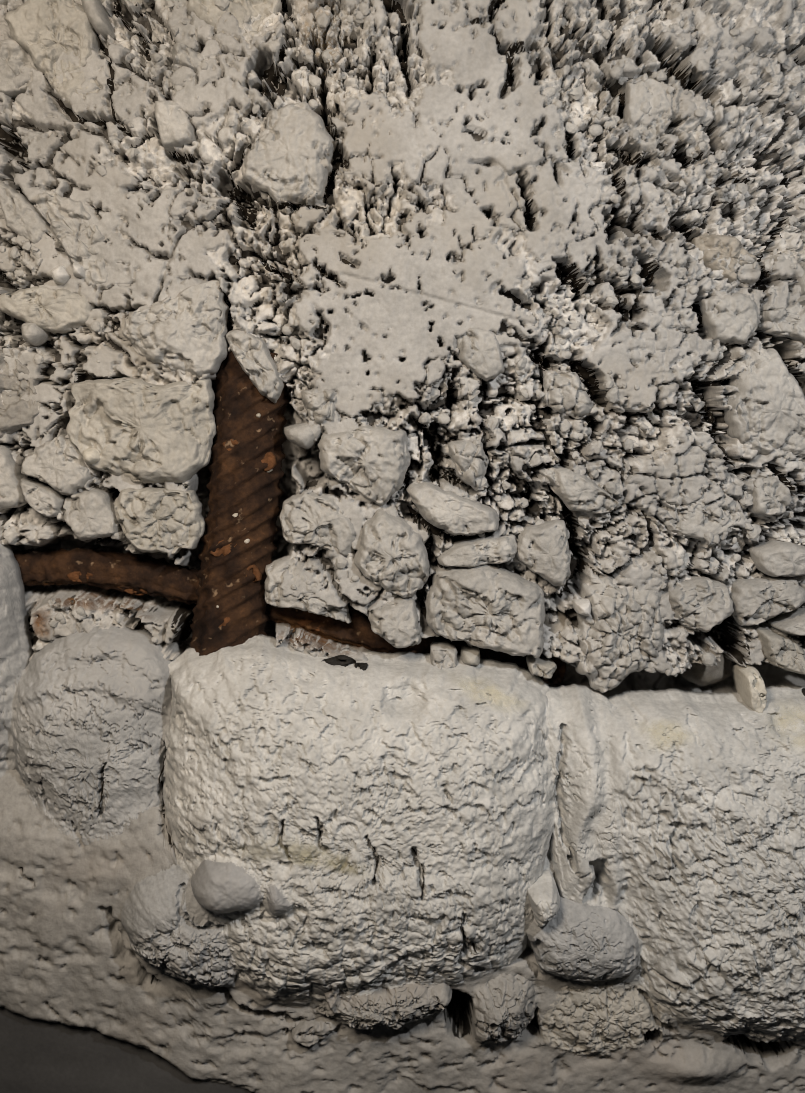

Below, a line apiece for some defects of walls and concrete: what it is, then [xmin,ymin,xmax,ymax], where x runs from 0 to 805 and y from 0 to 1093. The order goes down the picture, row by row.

spalling [12,350,566,686]
corrosion [59,589,129,608]
crack [411,847,425,896]